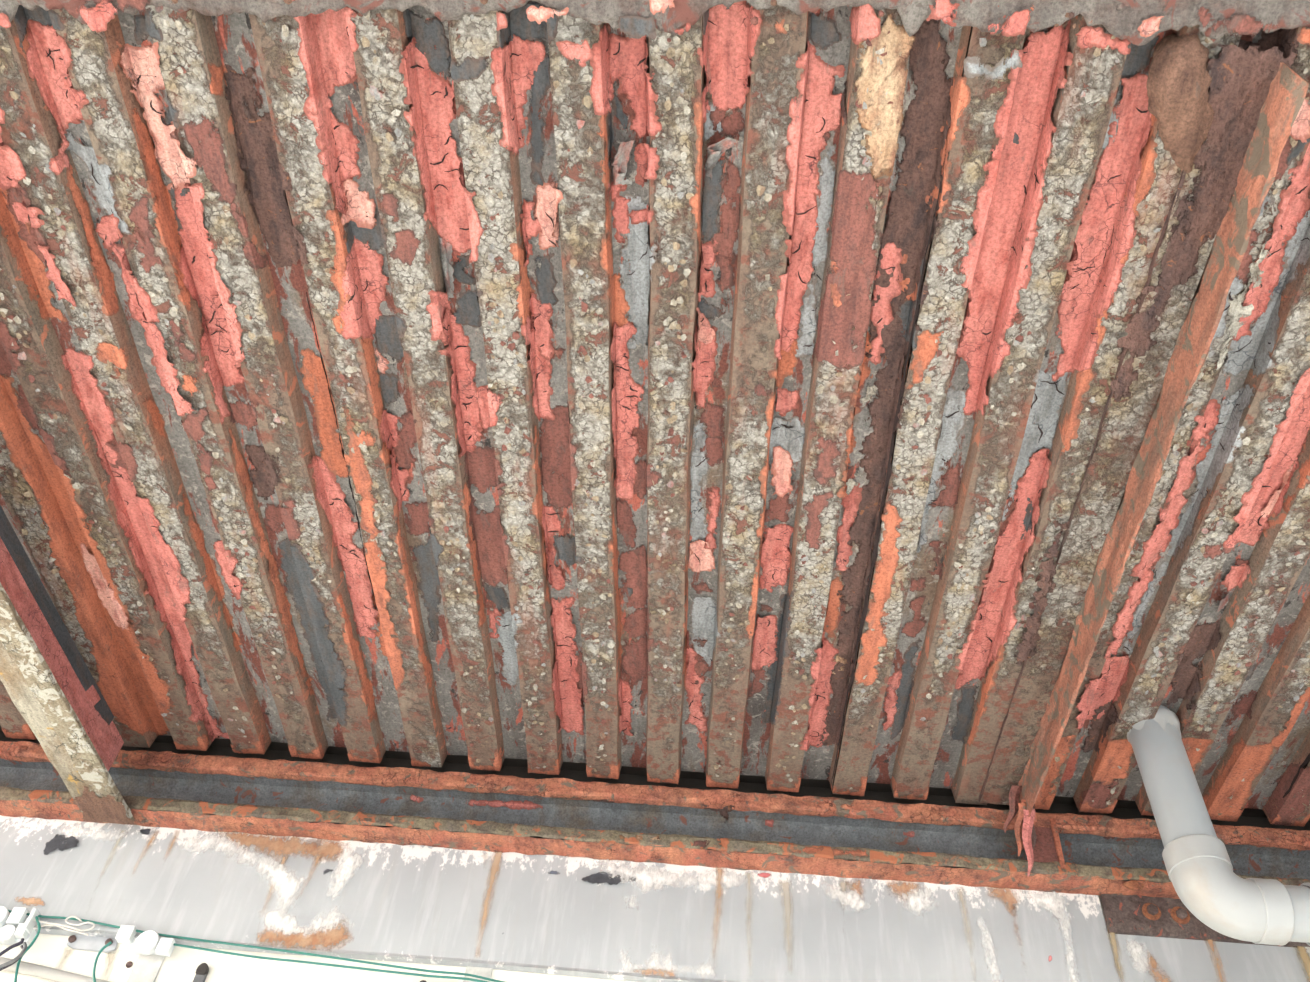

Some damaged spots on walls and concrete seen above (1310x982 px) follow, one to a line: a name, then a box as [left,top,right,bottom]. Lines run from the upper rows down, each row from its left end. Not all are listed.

peeling [0,5,250,743]
peeling [95,6,288,428]
peeling [278,0,789,777]
peeling [756,4,902,360]
peeling [912,19,1168,455]
rust [220,831,343,866]
rust [258,923,349,950]
rust [288,742,324,759]
rust [468,747,502,771]
rust [481,852,502,929]
rust [586,759,620,779]
peeling [688,475,864,782]